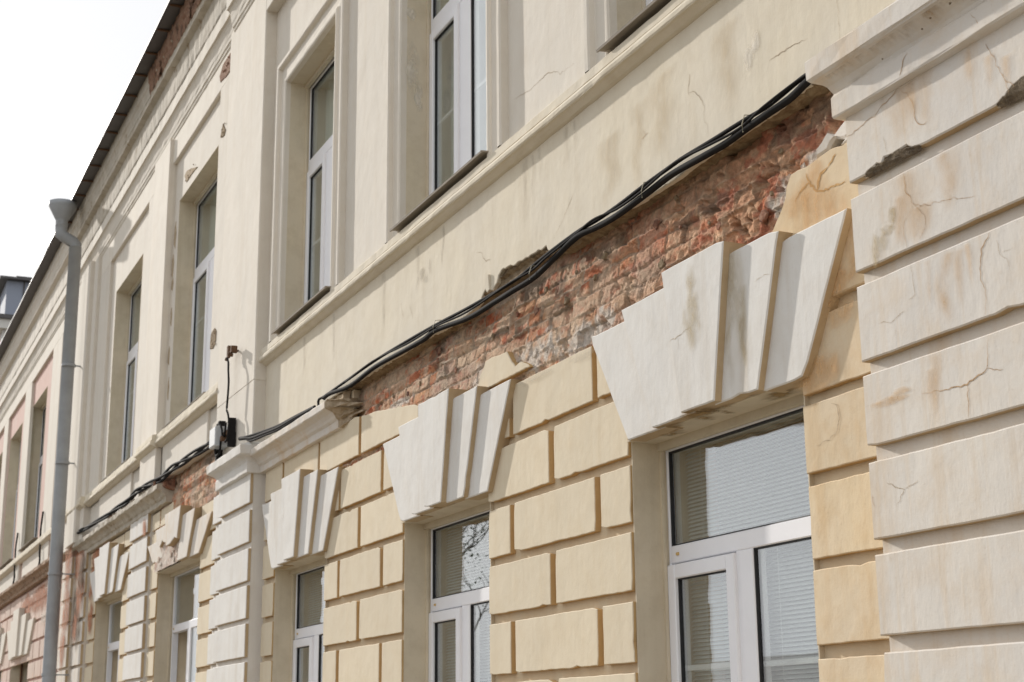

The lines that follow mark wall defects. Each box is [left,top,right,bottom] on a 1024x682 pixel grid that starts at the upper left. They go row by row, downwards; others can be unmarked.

spalling [996,77,1024,109]
spalling [863,145,924,179]
flaking render [357,91,847,417]
crack [979,235,1013,309]
crack [931,343,1002,414]
flaking render [107,450,219,519]
flaking render [343,445,384,468]